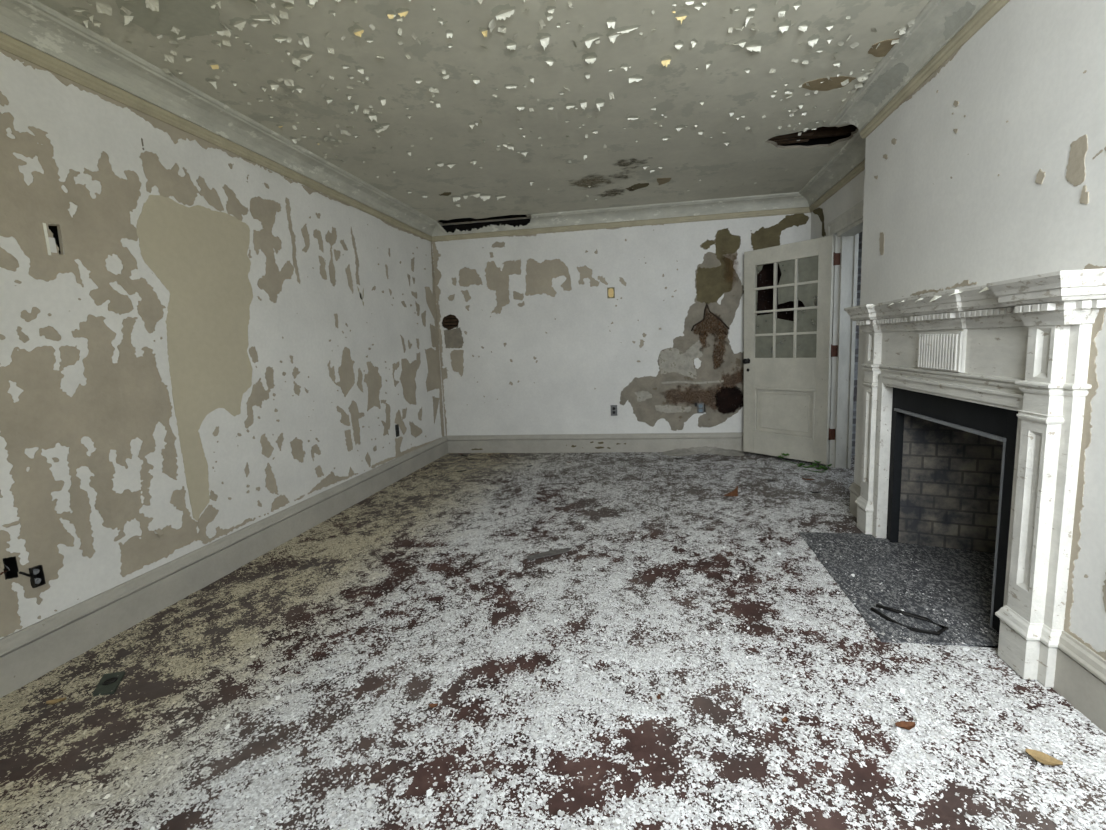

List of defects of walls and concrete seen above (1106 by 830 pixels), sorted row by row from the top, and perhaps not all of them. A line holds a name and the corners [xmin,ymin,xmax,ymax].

peeling [60,0,134,43]
peeling [205,0,401,163]
peeling [385,0,422,59]
peeling [468,0,698,79]
peeling [608,63,644,83]
peeling [671,0,710,24]
peeling [723,4,764,52]
peeling [762,0,916,146]
peeling [642,89,750,146]
peeling [1066,134,1106,204]
peeling [0,49,627,638]
flaking render [619,208,826,431]